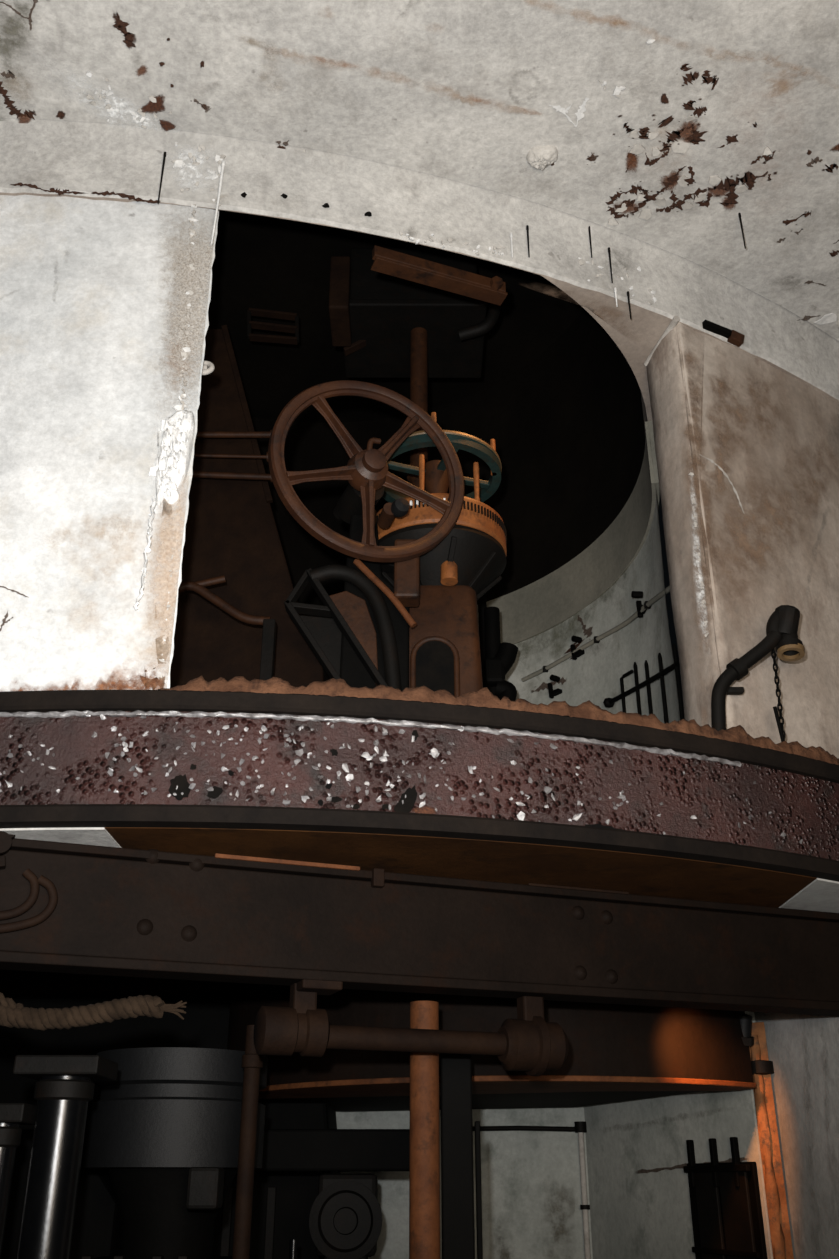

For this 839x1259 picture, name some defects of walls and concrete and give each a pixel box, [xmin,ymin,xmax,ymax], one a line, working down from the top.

crack [0,70,36,123]
crack [11,182,160,203]